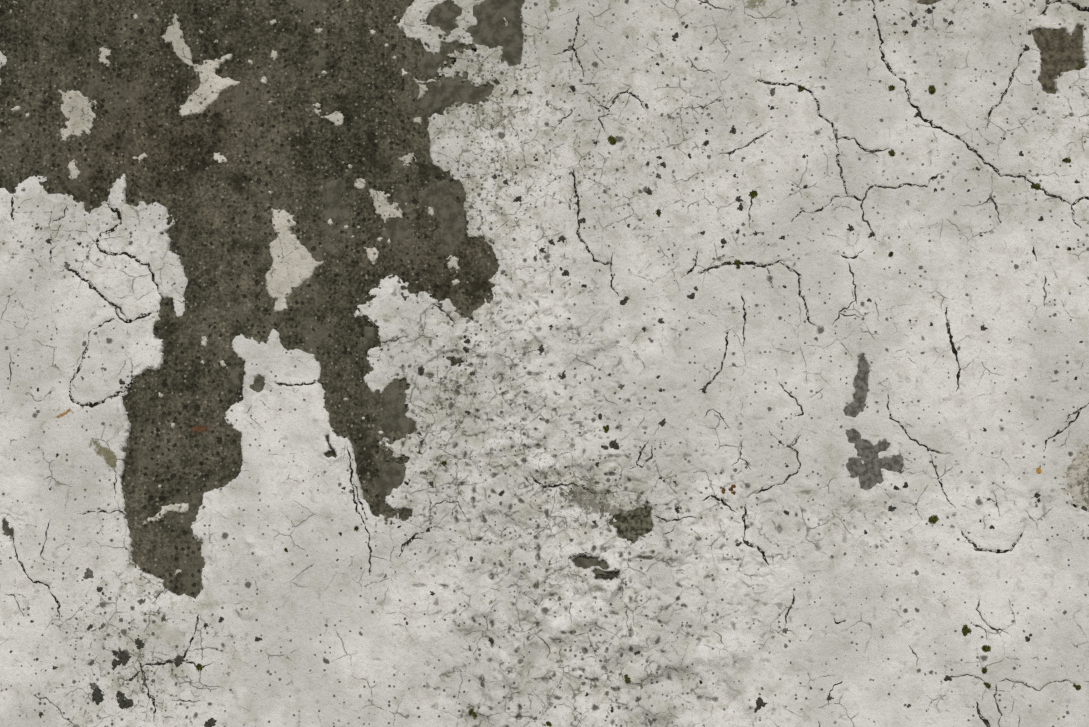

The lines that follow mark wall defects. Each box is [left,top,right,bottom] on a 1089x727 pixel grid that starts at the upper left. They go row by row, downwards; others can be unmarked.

crack [552,14,644,131]
crack [871,0,1089,228]
peeling [1032,24,1086,94]
crack [49,204,164,408]
peeling [0,0,525,599]
crack [572,169,619,296]
crack [654,295,825,565]
crack [681,79,942,335]
peeling [844,353,904,490]
crack [945,308,961,391]
crack [887,395,1023,553]
crack [950,674,1071,727]